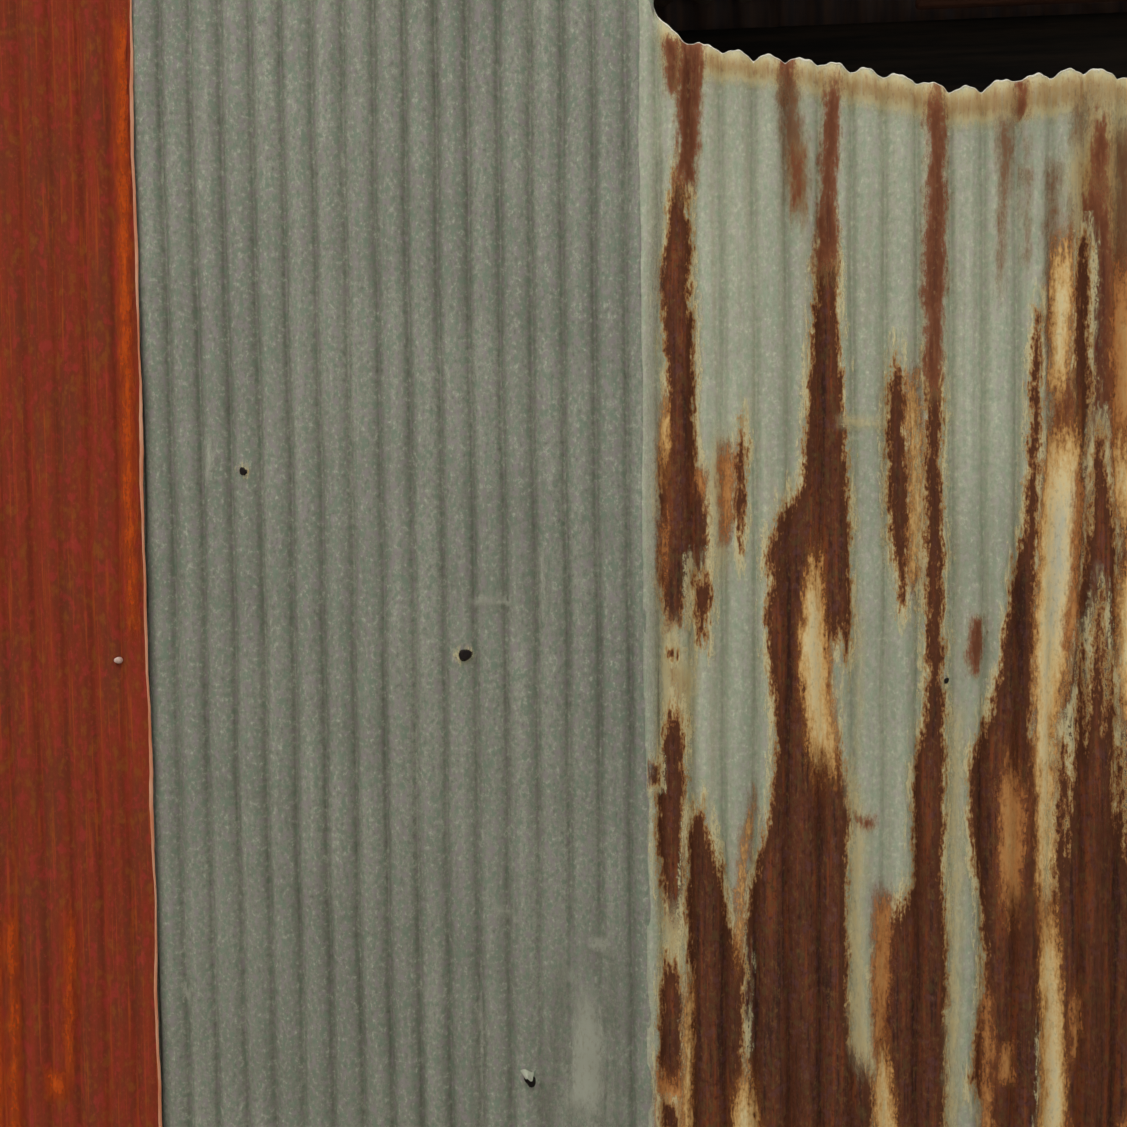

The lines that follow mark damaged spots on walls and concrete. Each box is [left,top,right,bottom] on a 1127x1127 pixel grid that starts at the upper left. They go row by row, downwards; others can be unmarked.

rust [115,26,137,629]
rust [647,26,1127,1127]
rust [0,920,22,1127]
rust [46,926,75,1095]